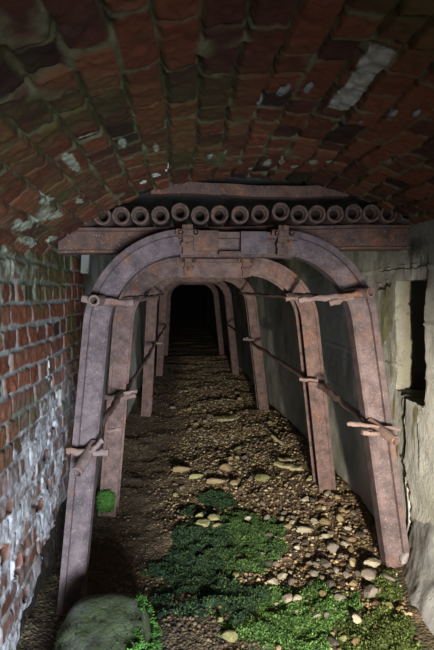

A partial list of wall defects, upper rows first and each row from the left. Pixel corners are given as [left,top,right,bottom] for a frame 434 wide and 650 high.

leakage [328,40,396,111]
leakage [62,153,81,172]
leakage [0,191,61,307]
leakage [45,356,62,411]
crack [402,397,421,530]